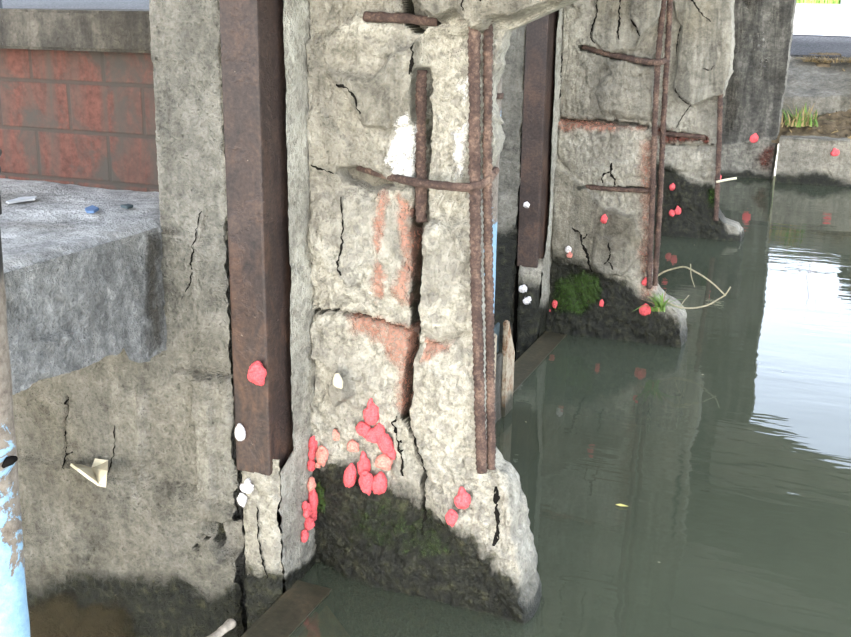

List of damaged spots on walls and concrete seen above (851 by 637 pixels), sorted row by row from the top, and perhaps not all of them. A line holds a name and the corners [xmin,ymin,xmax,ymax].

crack [590,0,598,44]
crack [616,0,640,39]
rust [558,119,626,132]
spalling [555,0,723,289]
rust [640,126,709,297]
spalling [306,0,526,496]
crack [256,507,268,578]
water stain [28,594,134,637]